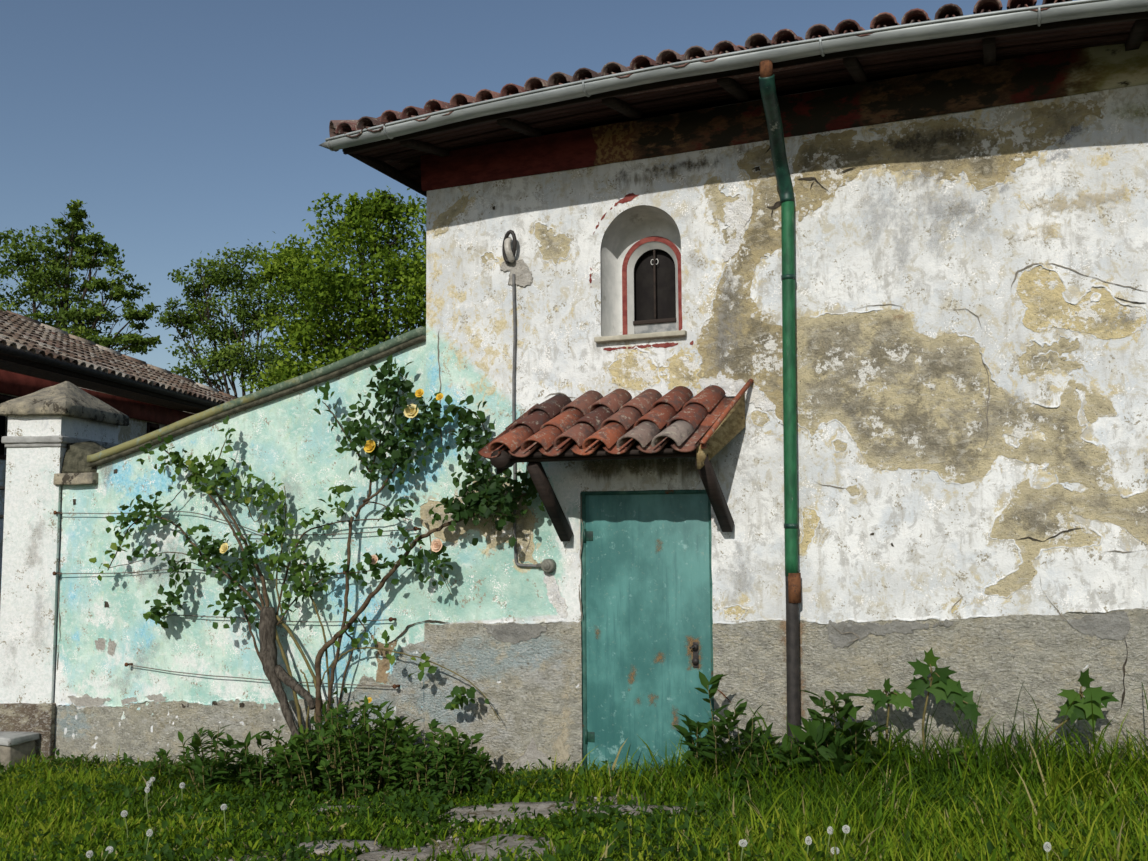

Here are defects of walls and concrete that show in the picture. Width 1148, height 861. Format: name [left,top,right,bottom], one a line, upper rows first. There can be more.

flaking render [785,126,889,157]
flaking render [603,151,783,428]
flaking render [1016,264,1148,332]
flaking render [983,514,1104,599]
crack [1016,528,1082,541]
flaking render [489,597,568,624]
spalling [358,631,406,684]
flaking render [56,693,249,708]